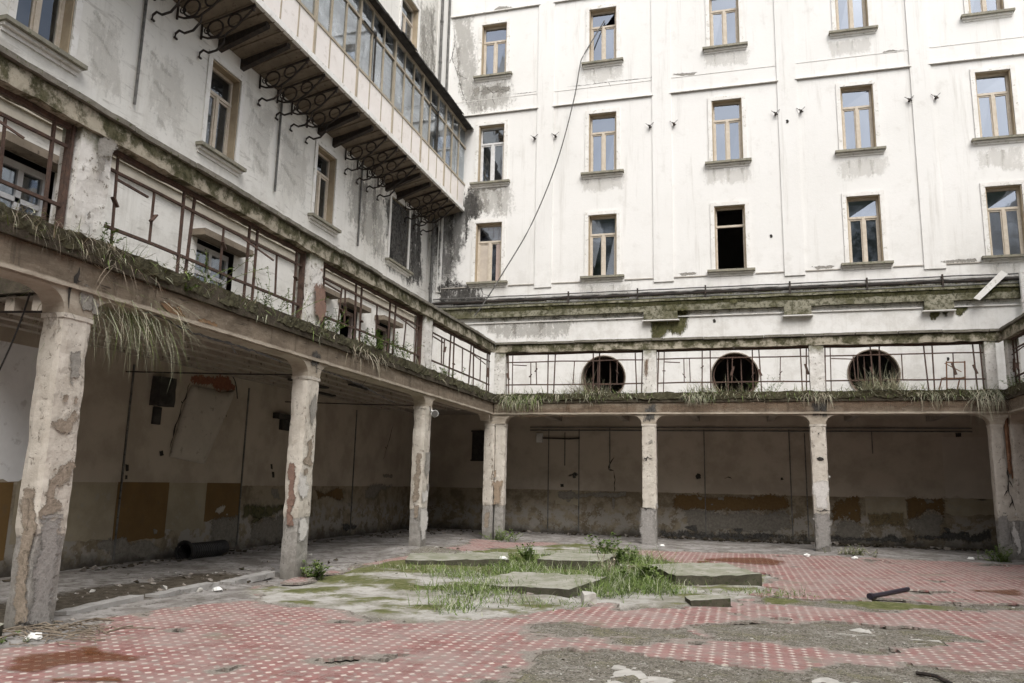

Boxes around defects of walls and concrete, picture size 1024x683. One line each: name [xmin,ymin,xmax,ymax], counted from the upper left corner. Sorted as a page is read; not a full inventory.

water stain [383,189,486,313]
water stain [652,309,685,338]
flaking render [51,351,82,433]
peeling [12,458,76,627]
flaking render [210,395,351,544]
flaking render [412,451,431,540]
water stain [660,525,807,541]
water stain [831,513,992,543]
crack [1004,470,1016,510]